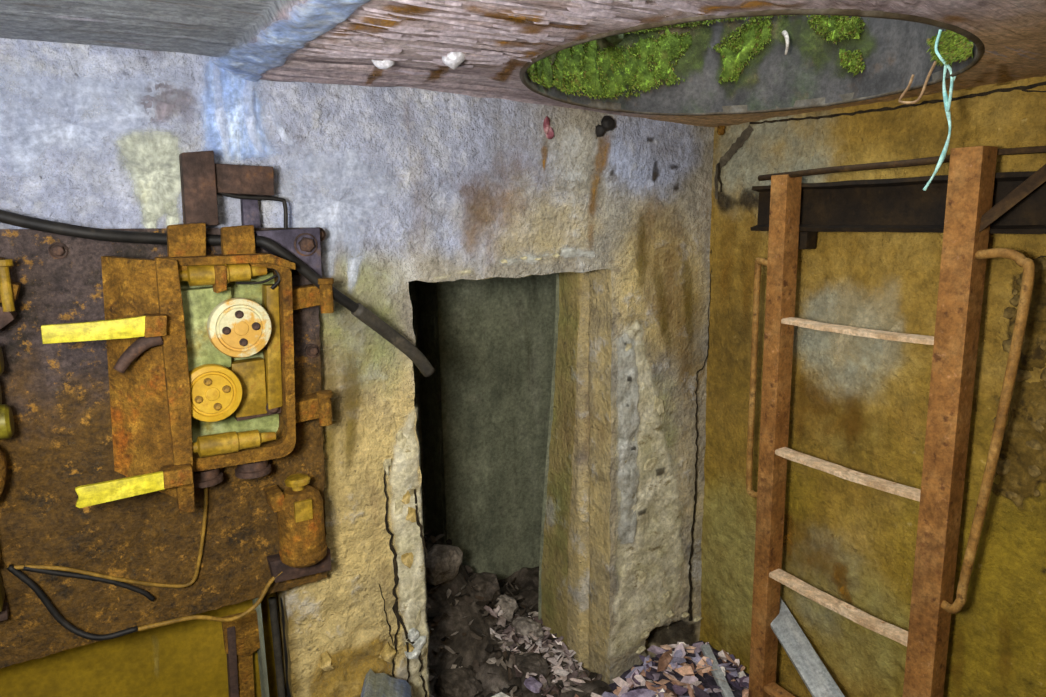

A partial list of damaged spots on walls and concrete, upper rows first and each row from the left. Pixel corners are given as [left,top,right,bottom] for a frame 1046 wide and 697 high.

water stain [0,79,181,228]
water stain [204,0,370,159]
corrosion [592,142,608,199]
crack [688,249,712,621]
spalling [992,256,1046,508]
crack [379,469,428,697]